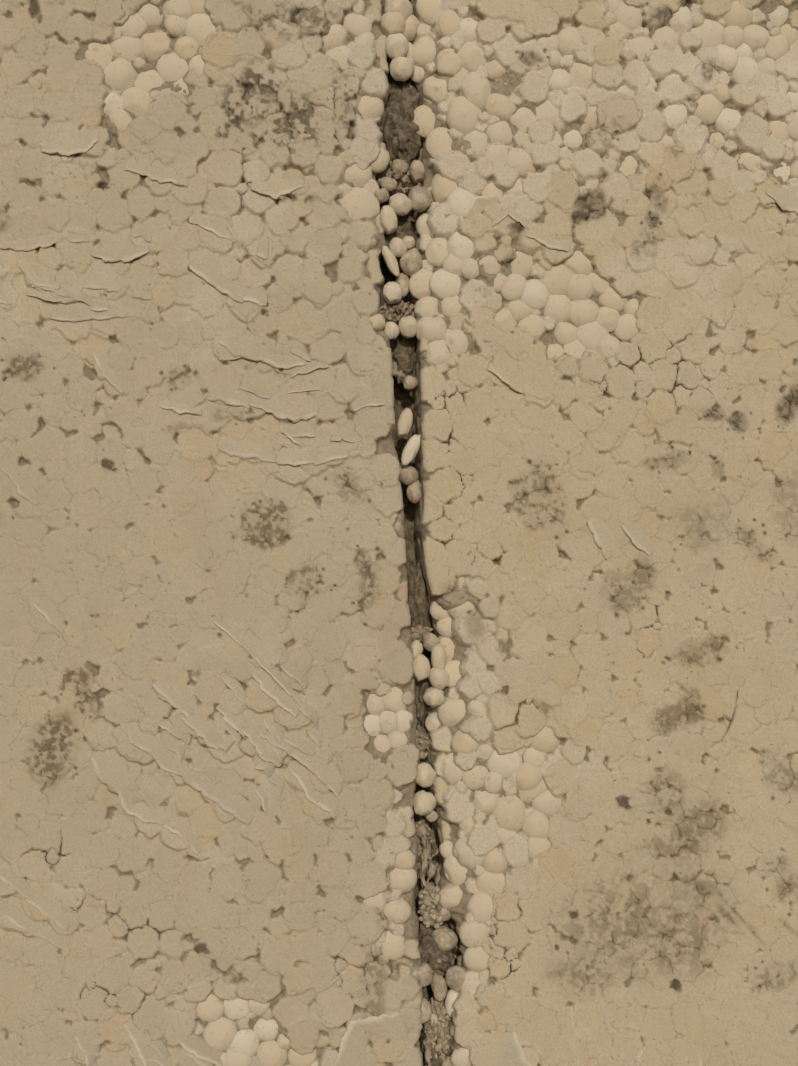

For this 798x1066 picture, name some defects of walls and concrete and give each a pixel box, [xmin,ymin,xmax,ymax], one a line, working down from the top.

spalling [607,0,798,157]
peeling [41,130,99,156]
peeling [124,155,188,187]
peeling [251,173,304,199]
spalling [735,153,760,170]
spalling [766,91,798,213]
peeling [50,302,128,322]
peeling [157,331,329,447]
crack [593,336,709,403]
peeling [210,617,343,819]
spalling [169,995,318,1066]
peeling [335,1012,409,1066]